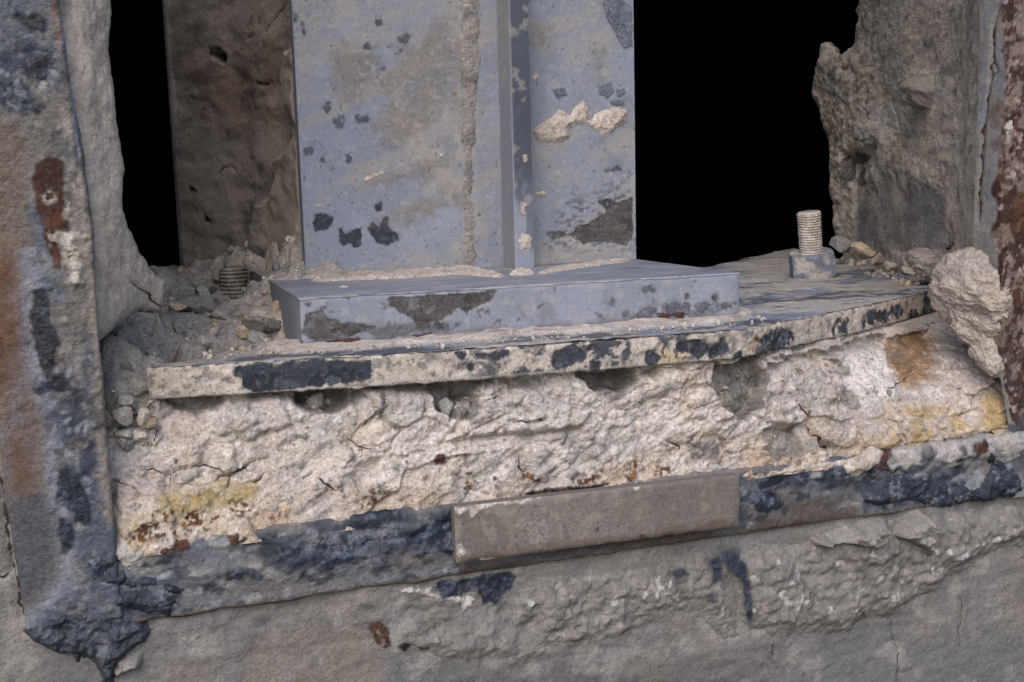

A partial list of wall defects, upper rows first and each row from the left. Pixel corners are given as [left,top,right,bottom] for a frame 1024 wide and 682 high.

corrosion [32,157,71,268]
peeling [547,198,633,245]
corrosion [1013,286,1022,309]
peeling [234,359,372,413]
spalling [440,349,509,419]
crack [115,428,263,494]
crack [302,473,335,490]
crack [346,394,388,458]
peeling [757,471,806,489]
spalling [764,426,801,460]
corrosion [129,508,219,555]
corrosion [369,621,390,648]